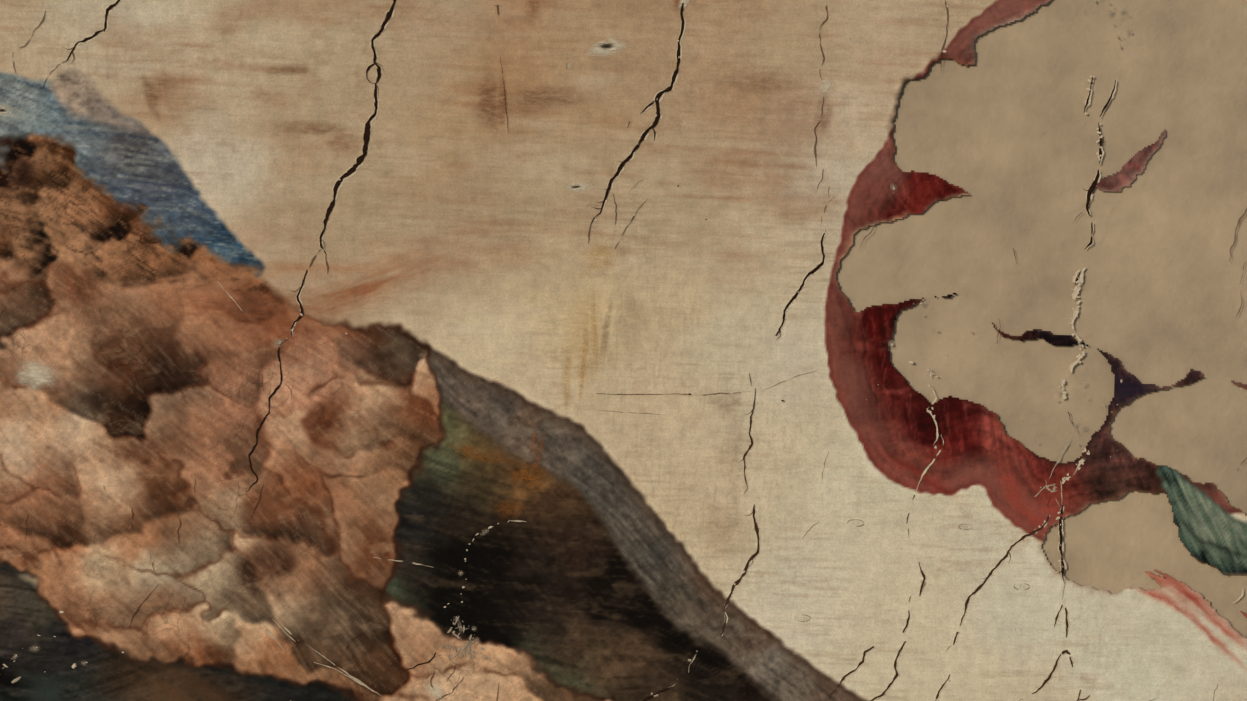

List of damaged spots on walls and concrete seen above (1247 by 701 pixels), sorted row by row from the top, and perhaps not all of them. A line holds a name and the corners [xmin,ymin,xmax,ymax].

crack [13,0,122,87]
crack [588,1,686,248]
crack [247,0,396,514]
flaking render [1049,267,1090,484]
peeling [440,520,510,659]
crack [596,371,815,701]
crack [830,370,944,701]
crack [935,481,1091,701]